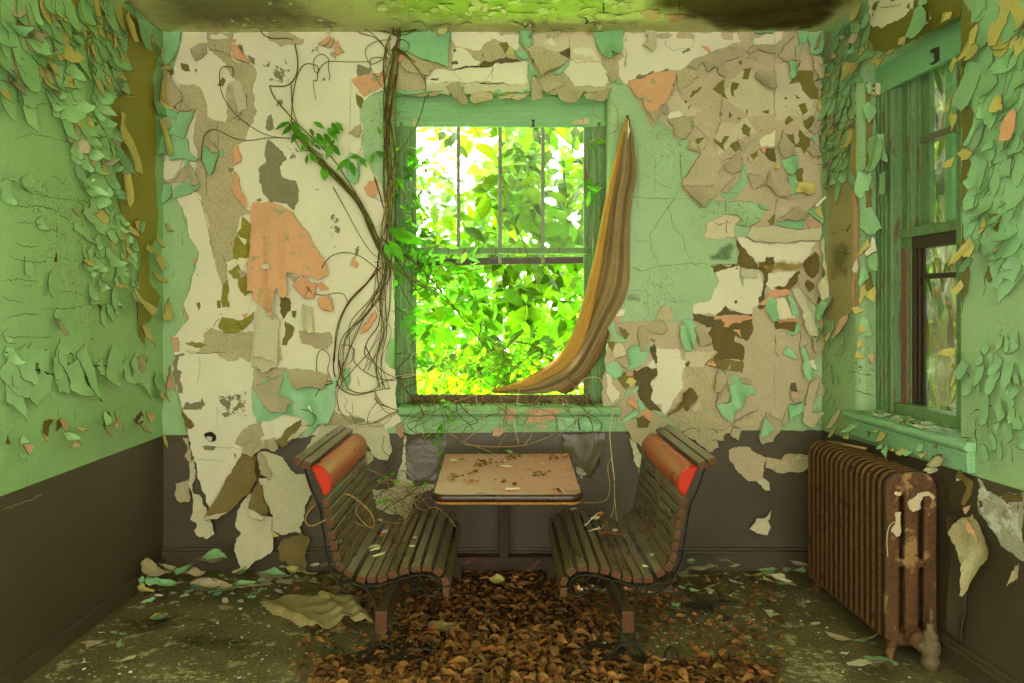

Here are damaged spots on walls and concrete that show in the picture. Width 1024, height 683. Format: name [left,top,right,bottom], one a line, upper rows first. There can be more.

water stain [716,3,829,29]
peeling [0,0,435,575]
peeling [393,0,1024,475]
peeling [750,511,771,535]
peeling [729,446,808,491]
spalling [946,470,1024,642]